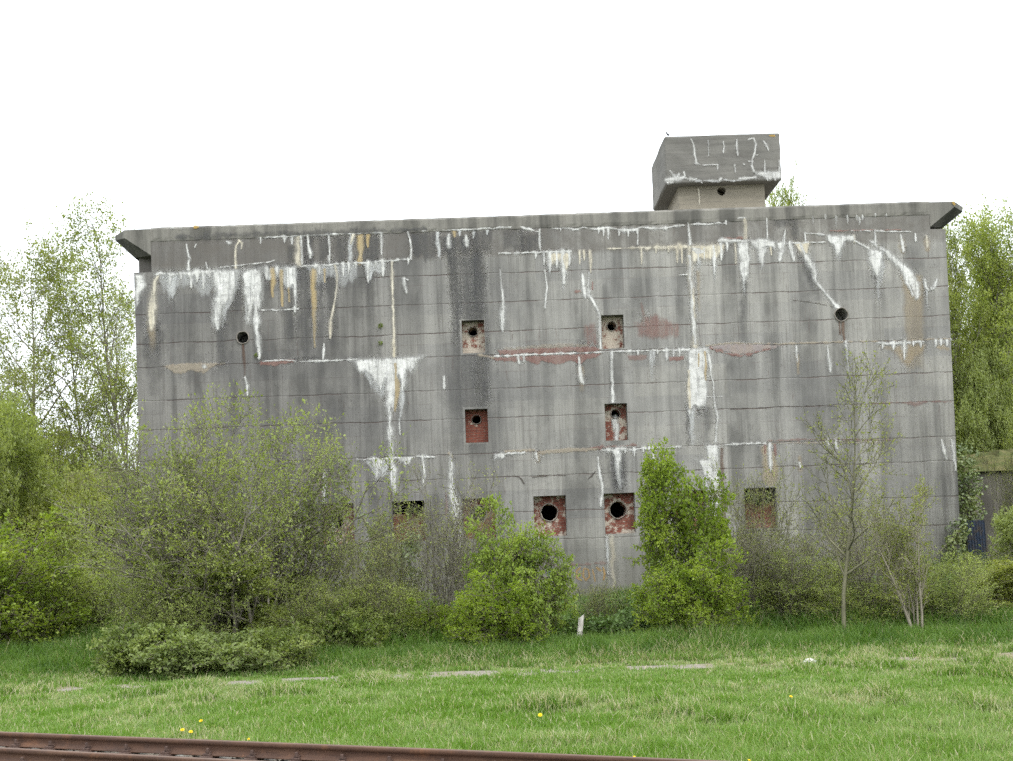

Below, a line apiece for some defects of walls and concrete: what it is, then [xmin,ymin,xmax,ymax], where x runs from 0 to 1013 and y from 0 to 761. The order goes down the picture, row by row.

water stain [665,139,781,205]
water stain [553,216,938,299]
water stain [135,223,708,493]
water stain [877,339,948,360]
water stain [448,452,462,553]
water stain [597,416,682,507]
water stain [699,442,777,516]